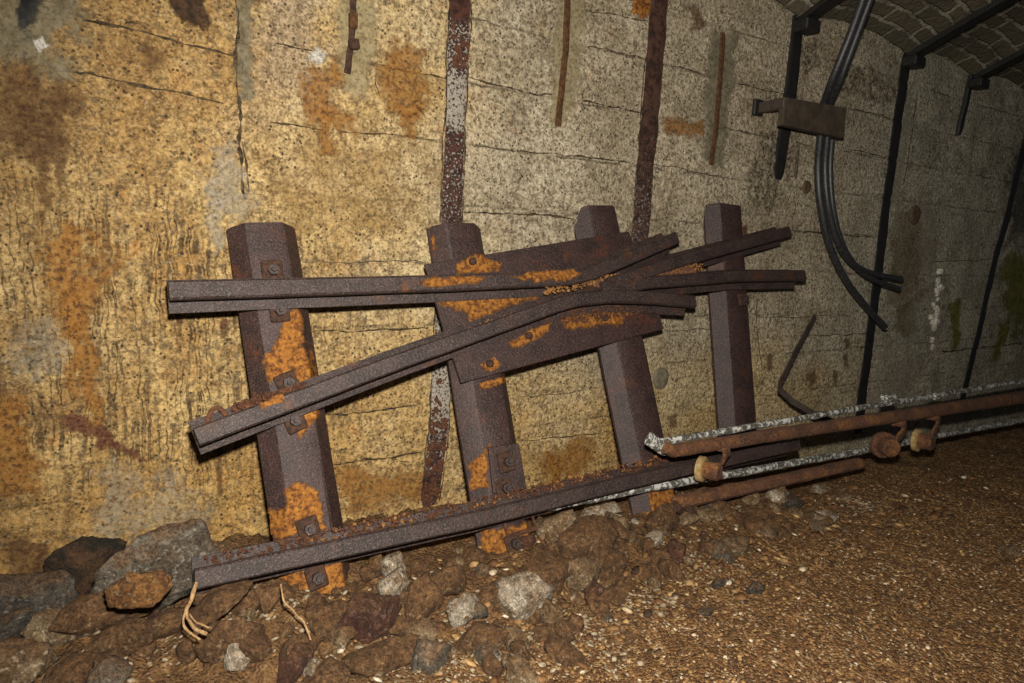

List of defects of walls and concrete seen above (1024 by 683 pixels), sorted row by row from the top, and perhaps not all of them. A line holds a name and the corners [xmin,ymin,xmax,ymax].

crack [67,0,249,200]
corrosion [300,28,356,155]
corrosion [376,39,428,138]
corrosion [665,32,725,165]
corrosion [36,221,146,462]
leakage [929,268,961,350]